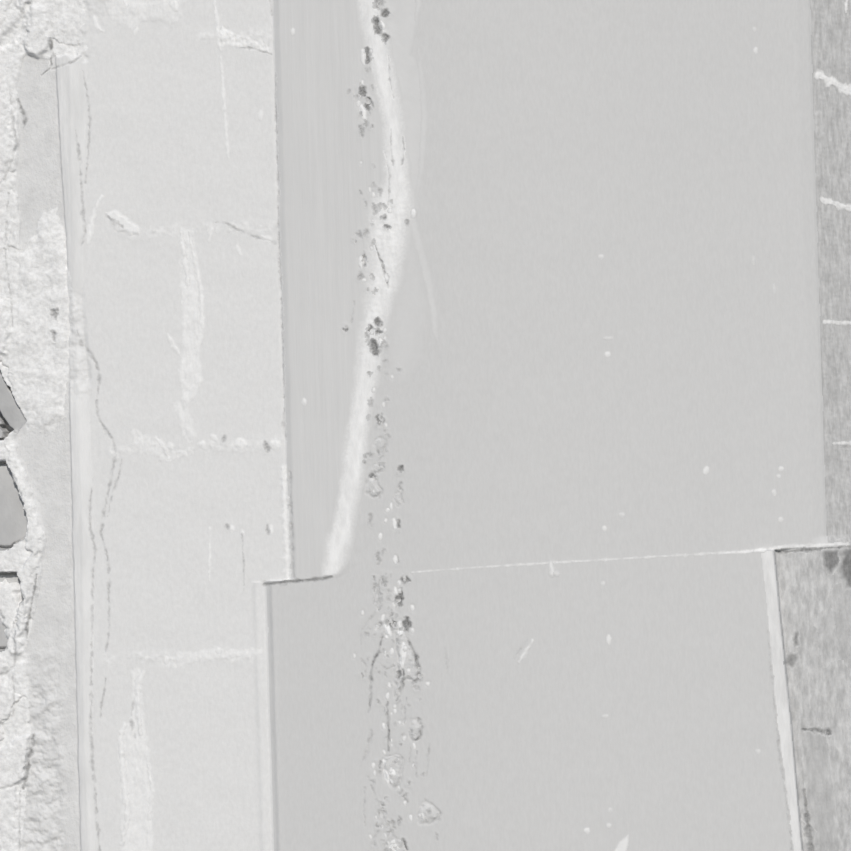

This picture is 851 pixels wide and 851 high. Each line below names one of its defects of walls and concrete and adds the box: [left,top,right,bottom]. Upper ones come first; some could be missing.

spalling [371,0,391,45]
spalling [346,46,375,139]
spalling [352,181,393,295]
spalling [49,307,59,343]
spalling [364,316,403,379]
crack [76,329,123,851]
spalling [352,387,443,851]
damp [813,545,851,668]